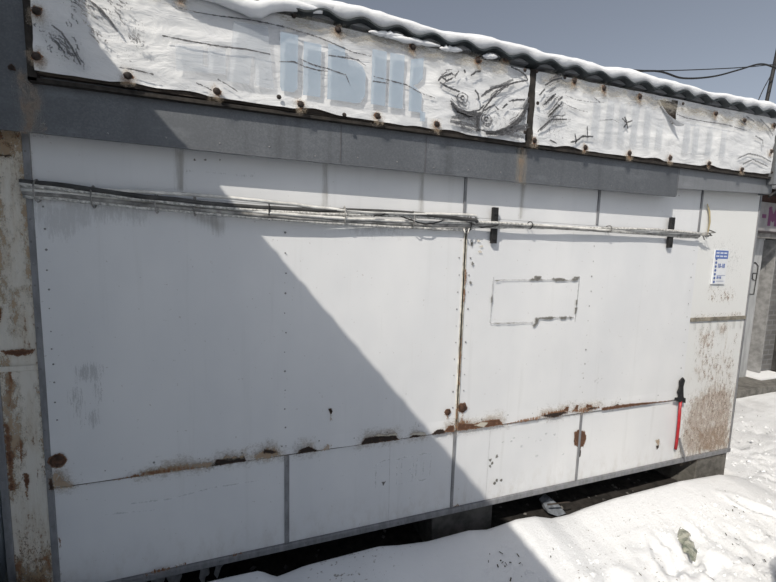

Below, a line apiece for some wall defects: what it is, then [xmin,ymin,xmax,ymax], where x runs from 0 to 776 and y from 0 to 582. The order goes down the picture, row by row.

corrosion [0,193,32,332]
corrosion [0,349,73,500]
corrosion [444,400,671,431]
corrosion [254,448,279,460]
corrosion [574,430,587,457]
corrosion [115,462,212,480]
corrosion [14,529,62,582]